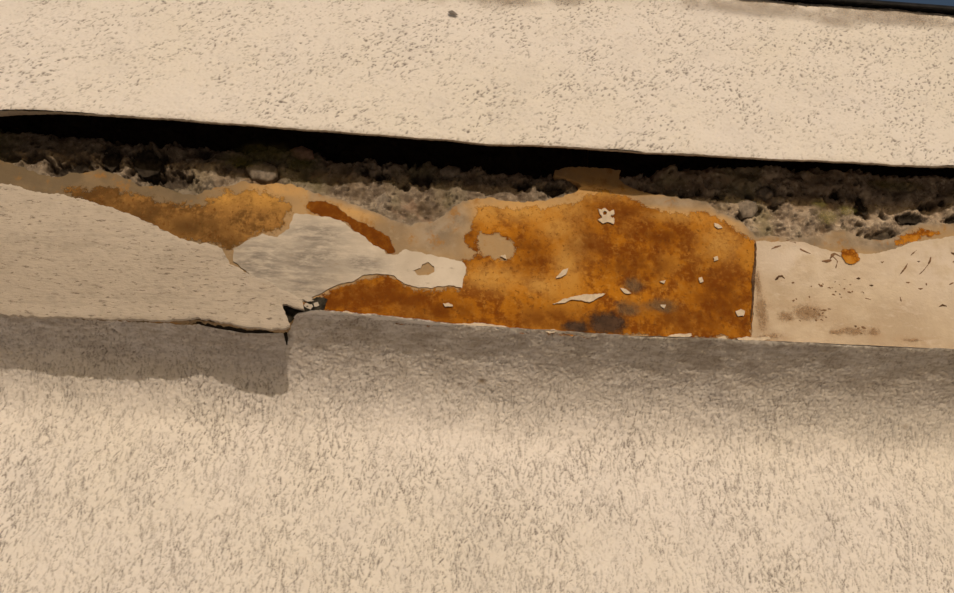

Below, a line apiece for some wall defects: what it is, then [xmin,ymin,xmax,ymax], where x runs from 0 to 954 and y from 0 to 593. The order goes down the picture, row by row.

flaking render [0,114,954,349]
rust [894,228,940,246]
crack [185,321,288,345]